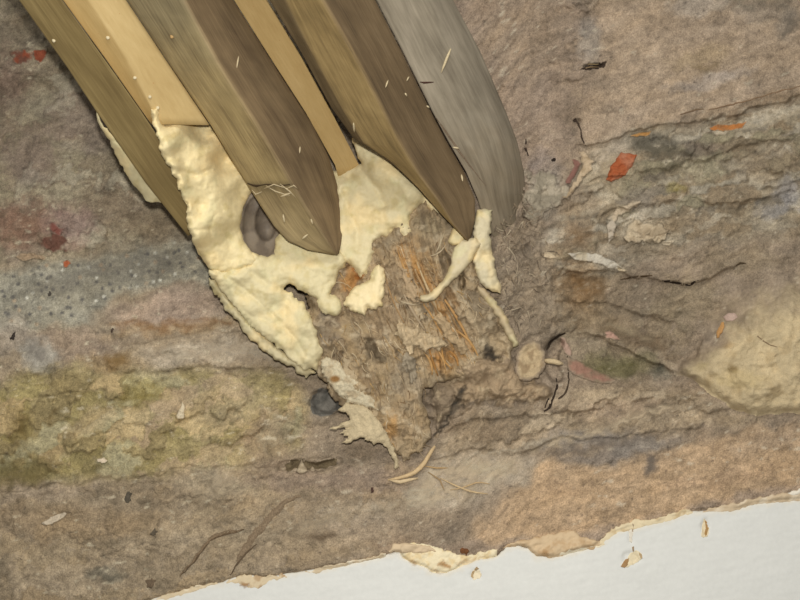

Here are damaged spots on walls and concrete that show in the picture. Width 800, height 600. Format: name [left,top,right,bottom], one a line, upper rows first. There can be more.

crack [680,86,800,115]
crack [620,275,699,286]
peeling [701,488,800,538]
peeling [305,509,693,580]
peeling [156,573,287,600]